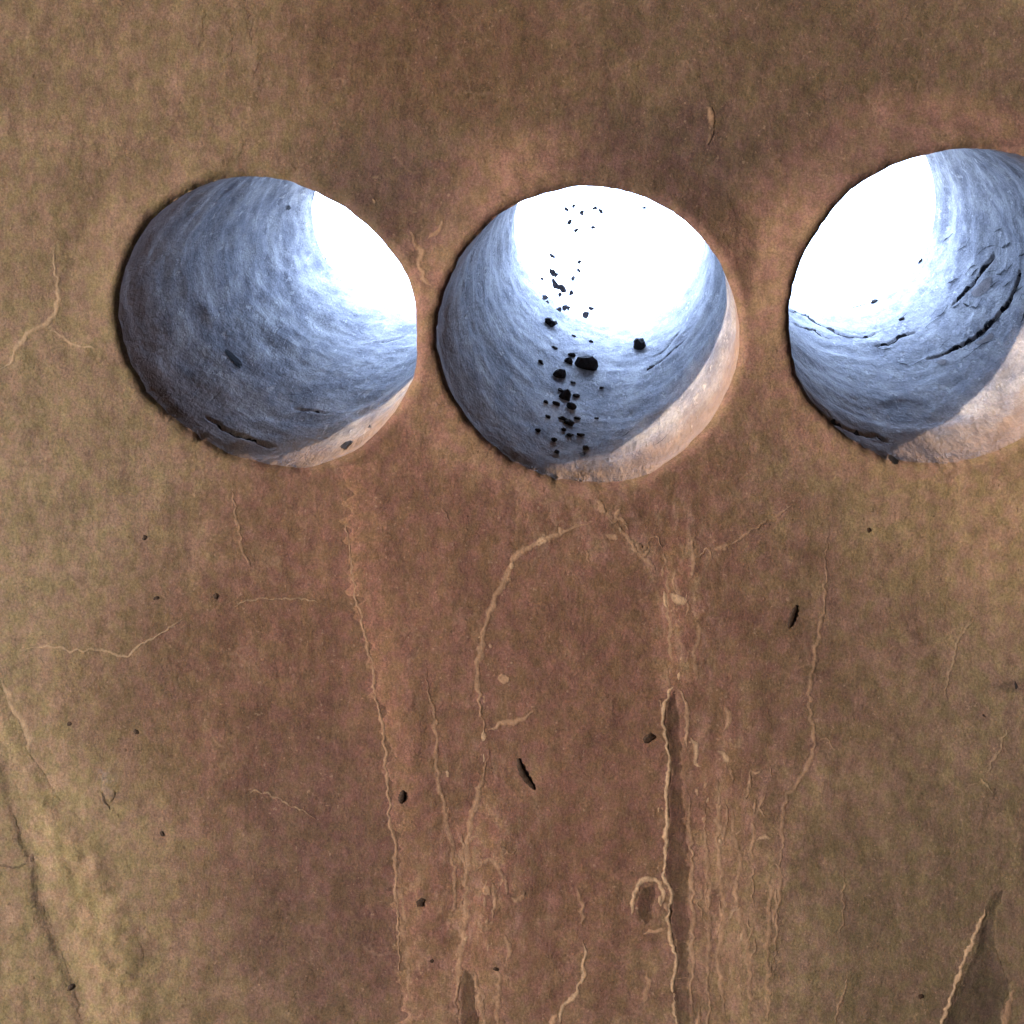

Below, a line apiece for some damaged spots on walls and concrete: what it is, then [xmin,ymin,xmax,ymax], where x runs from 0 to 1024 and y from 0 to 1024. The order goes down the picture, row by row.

crack [0,245,97,370]
damp [629,705,825,1024]